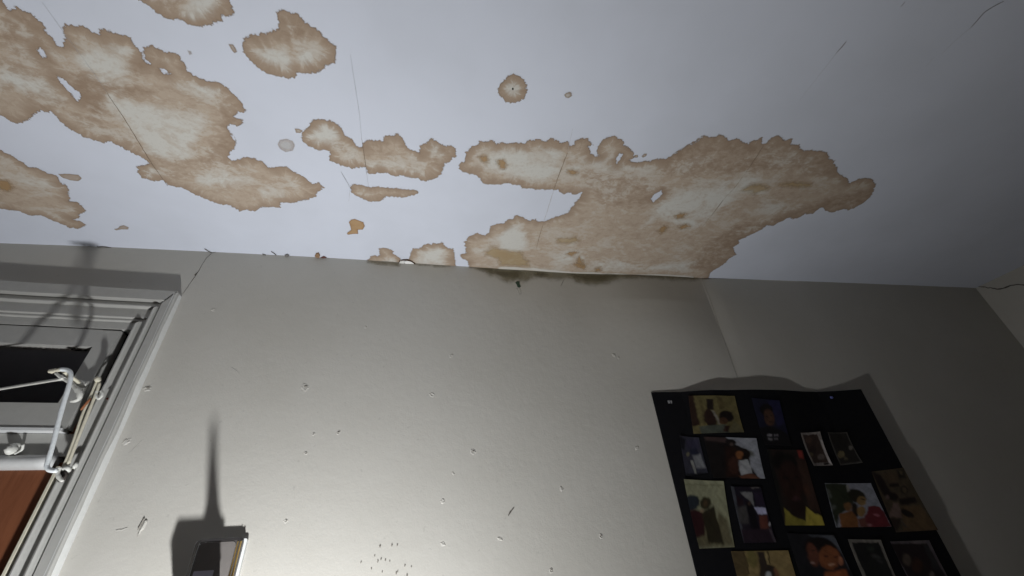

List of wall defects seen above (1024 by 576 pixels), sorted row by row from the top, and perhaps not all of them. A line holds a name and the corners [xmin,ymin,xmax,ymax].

leakage [0,0,337,212]
leakage [498,74,528,103]
leakage [0,150,86,229]
leakage [295,119,876,284]